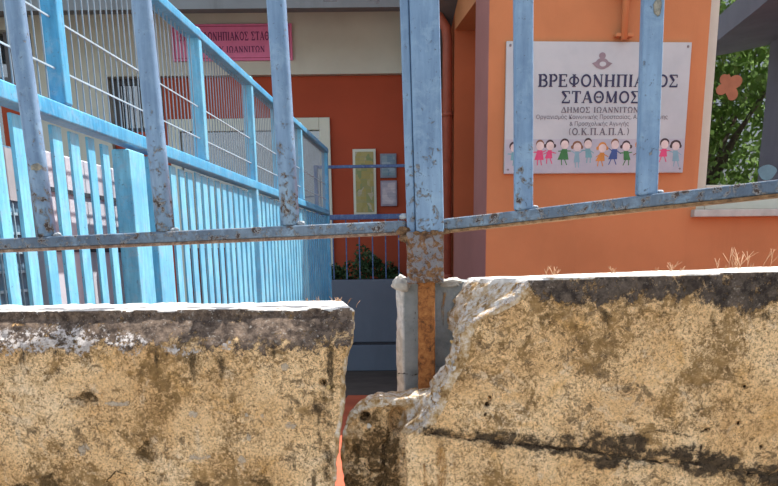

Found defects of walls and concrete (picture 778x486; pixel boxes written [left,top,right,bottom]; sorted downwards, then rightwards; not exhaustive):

water stain [528,272,778,323]
spalling [407,281,534,430]
water stain [0,308,354,481]
crack [424,428,760,475]
water stain [40,473,62,486]